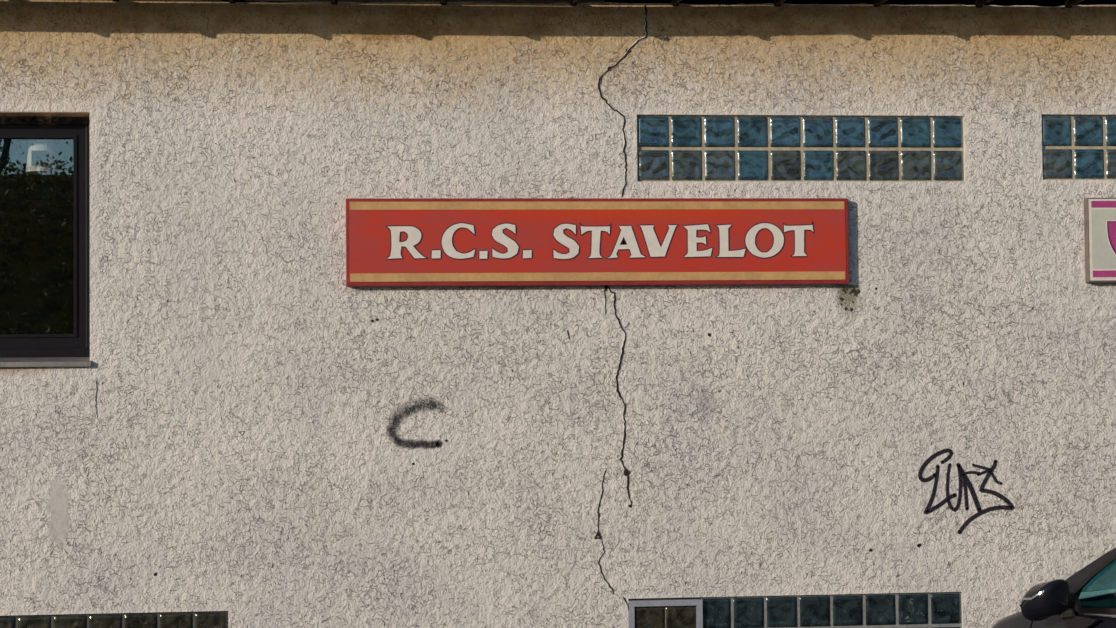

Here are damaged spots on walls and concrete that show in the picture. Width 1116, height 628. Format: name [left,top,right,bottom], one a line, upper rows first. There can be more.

crack [598,5,649,196]
crack [597,285,632,610]